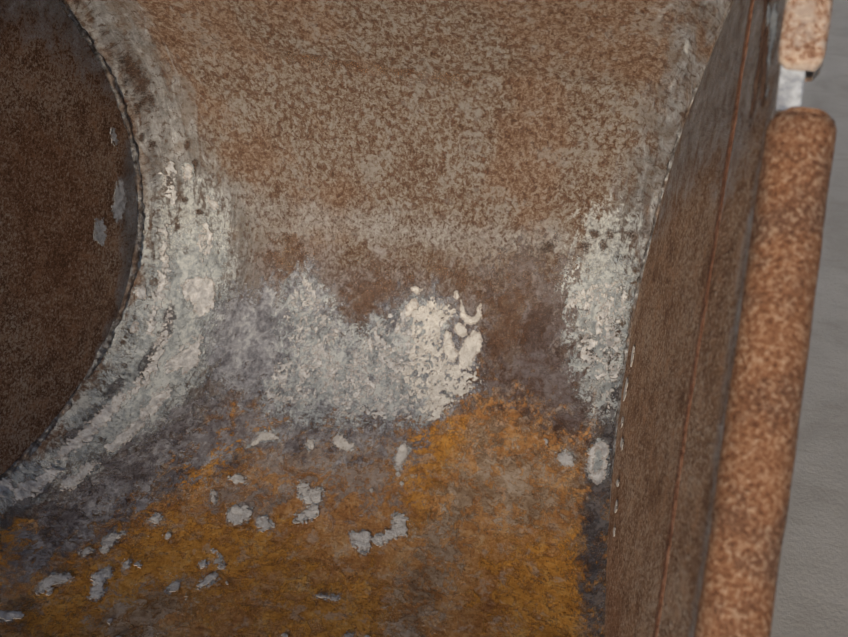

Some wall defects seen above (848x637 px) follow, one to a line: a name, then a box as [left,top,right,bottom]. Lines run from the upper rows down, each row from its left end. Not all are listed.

corrosion [749,0,771,126]
corrosion [258,233,315,286]
leakage [0,482,52,541]
leakage [57,303,177,446]
corrosion [0,257,610,637]
leakage [463,234,619,637]